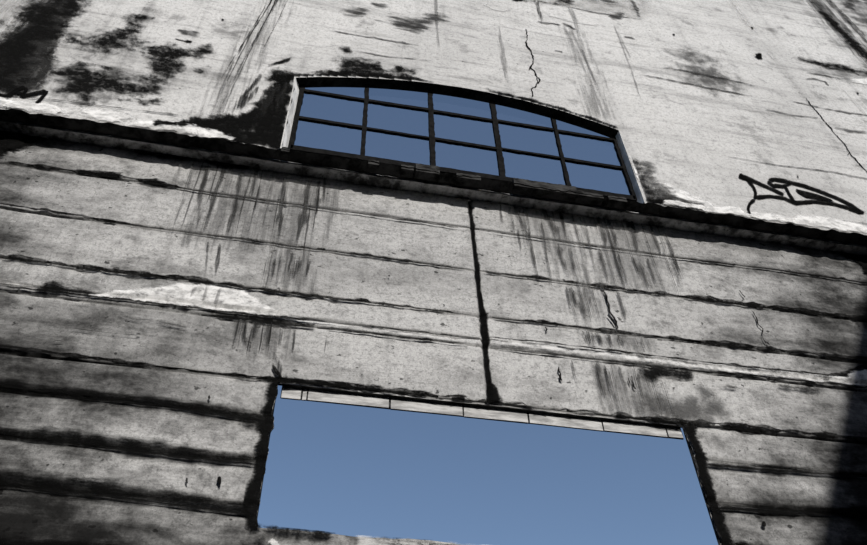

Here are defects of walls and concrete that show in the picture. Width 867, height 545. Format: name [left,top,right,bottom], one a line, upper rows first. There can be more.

damp [0,0,212,106]
crack [525,21,576,96]
crack [733,73,867,179]
damp [0,131,462,270]
damp [0,205,867,545]